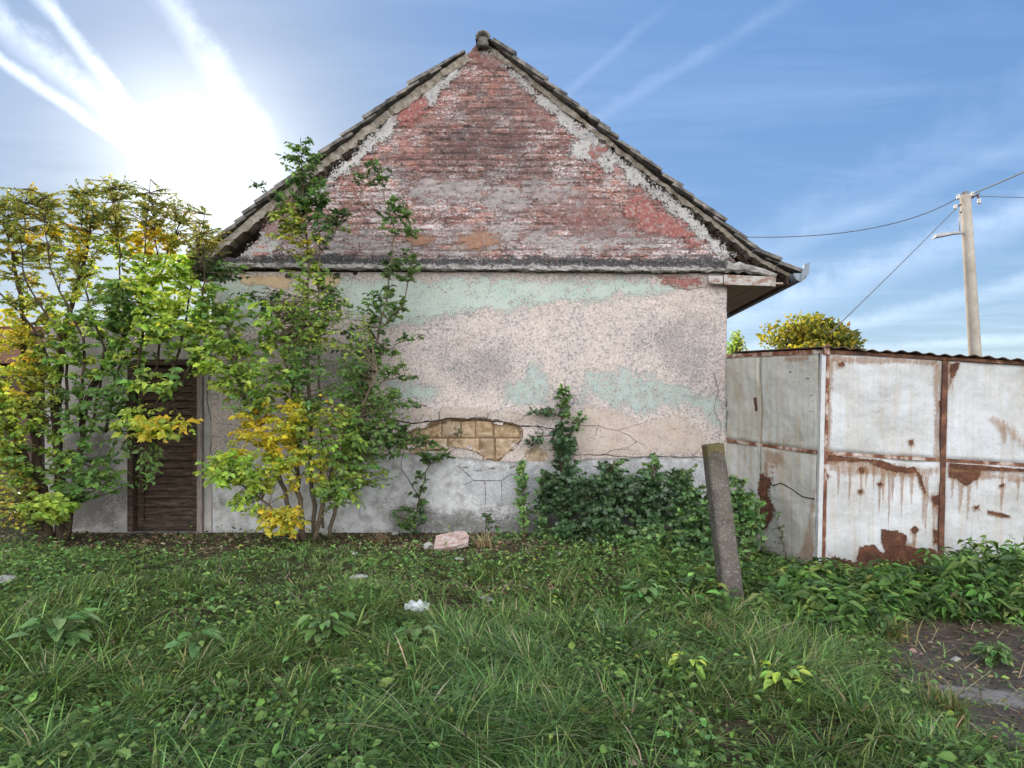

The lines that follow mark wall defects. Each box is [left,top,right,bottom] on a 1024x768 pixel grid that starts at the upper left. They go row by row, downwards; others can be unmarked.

peeling [237,48,737,260]
spalling [381,361,554,464]
crack [383,372,721,458]
crack [458,466,514,505]
corrosion [756,472,776,531]
crack [759,479,815,500]
corrosion [826,455,939,506]
corrosion [948,463,1024,487]
corrosion [831,526,938,573]